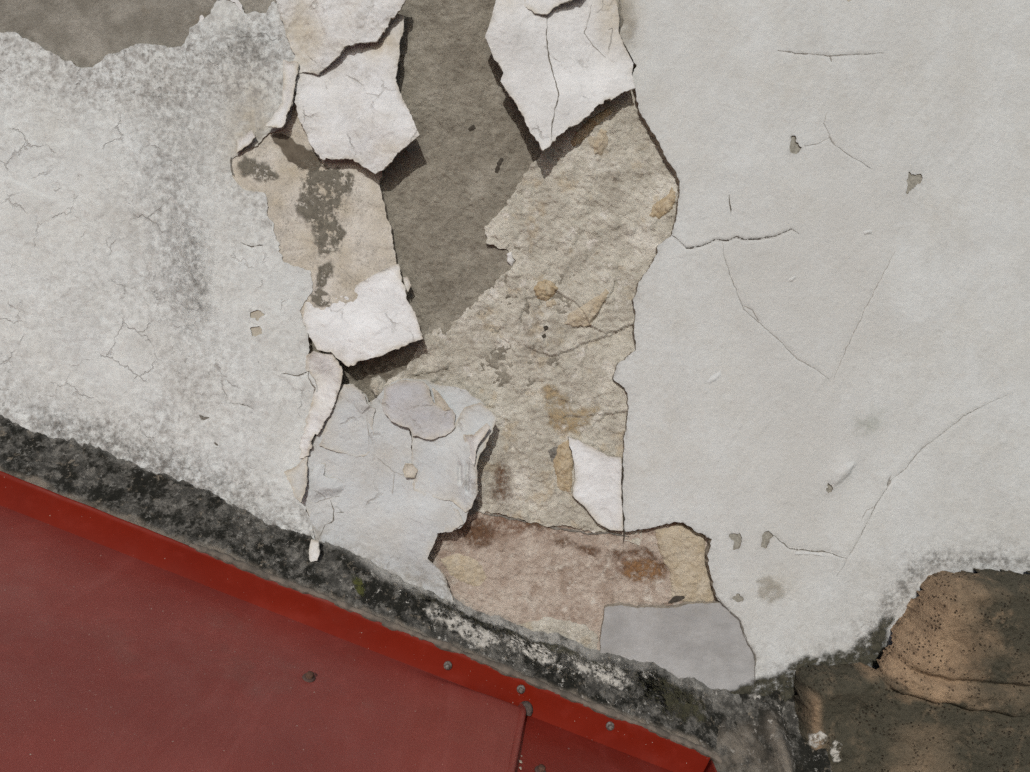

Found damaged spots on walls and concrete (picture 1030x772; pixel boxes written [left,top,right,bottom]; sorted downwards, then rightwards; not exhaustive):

crack [779,50,881,62]
spalling [232,0,718,651]
crack [671,229,895,380]
damp [543,385,596,432]
damp [493,468,508,499]
crack [772,395,1006,571]
peeling [729,533,742,549]
damp [418,594,631,686]
damp [731,560,933,701]
damp [809,731,840,762]